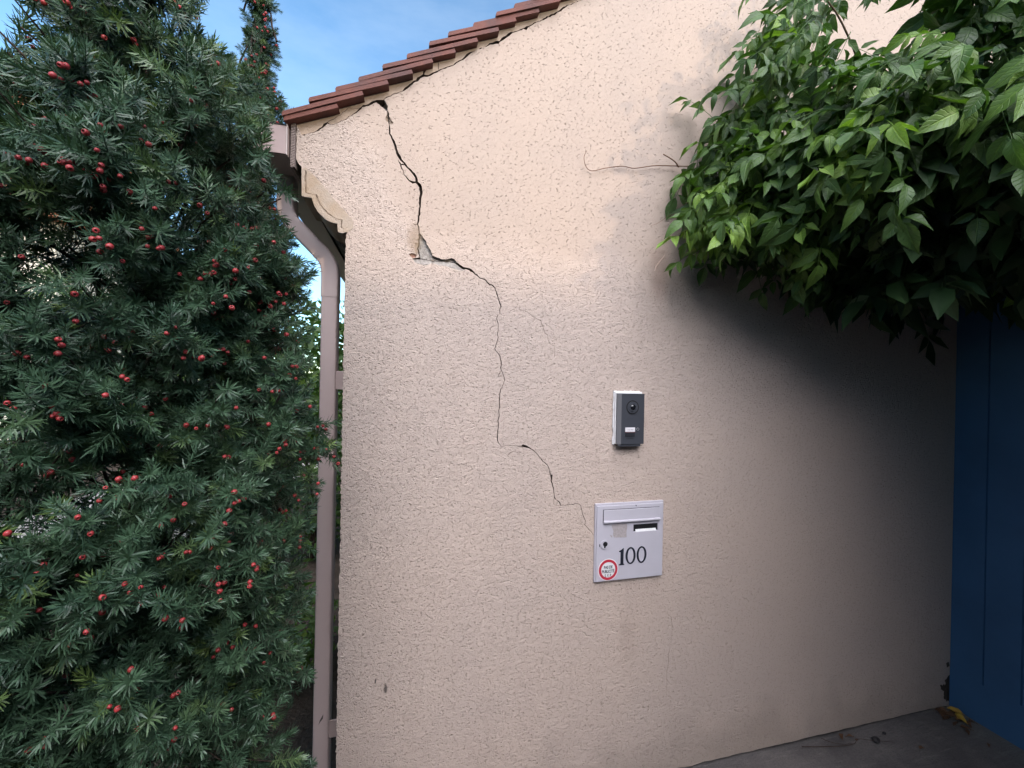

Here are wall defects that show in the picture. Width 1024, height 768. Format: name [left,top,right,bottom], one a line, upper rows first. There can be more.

spalling [409,234,465,271]
crack [304,0,593,534]